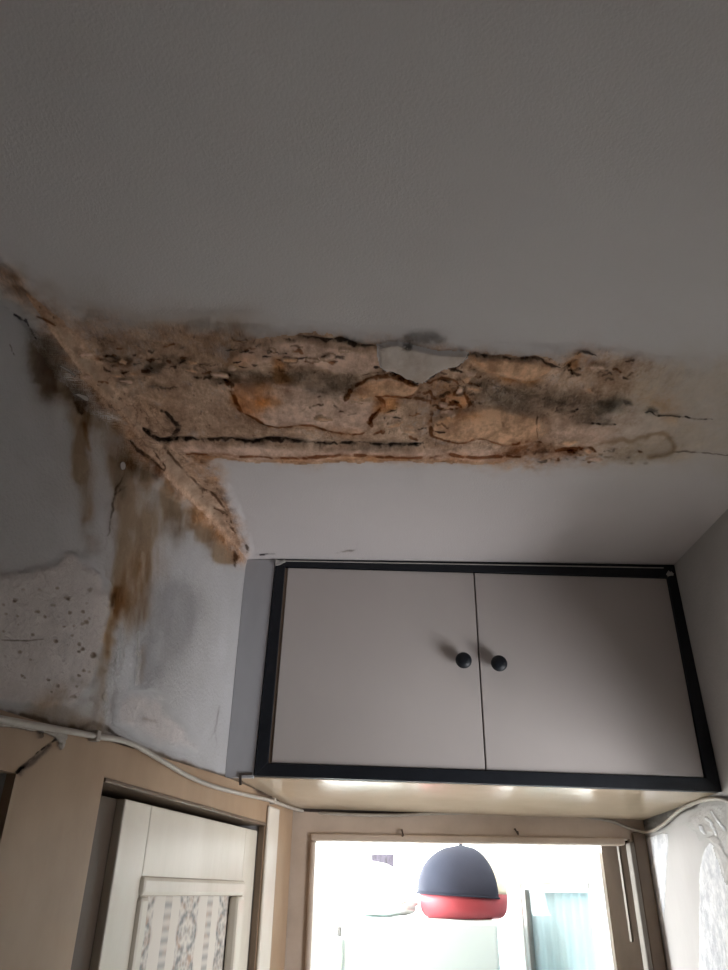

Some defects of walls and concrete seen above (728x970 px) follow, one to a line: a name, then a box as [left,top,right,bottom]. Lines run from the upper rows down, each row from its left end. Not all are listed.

flaking render [0,248,728,580]